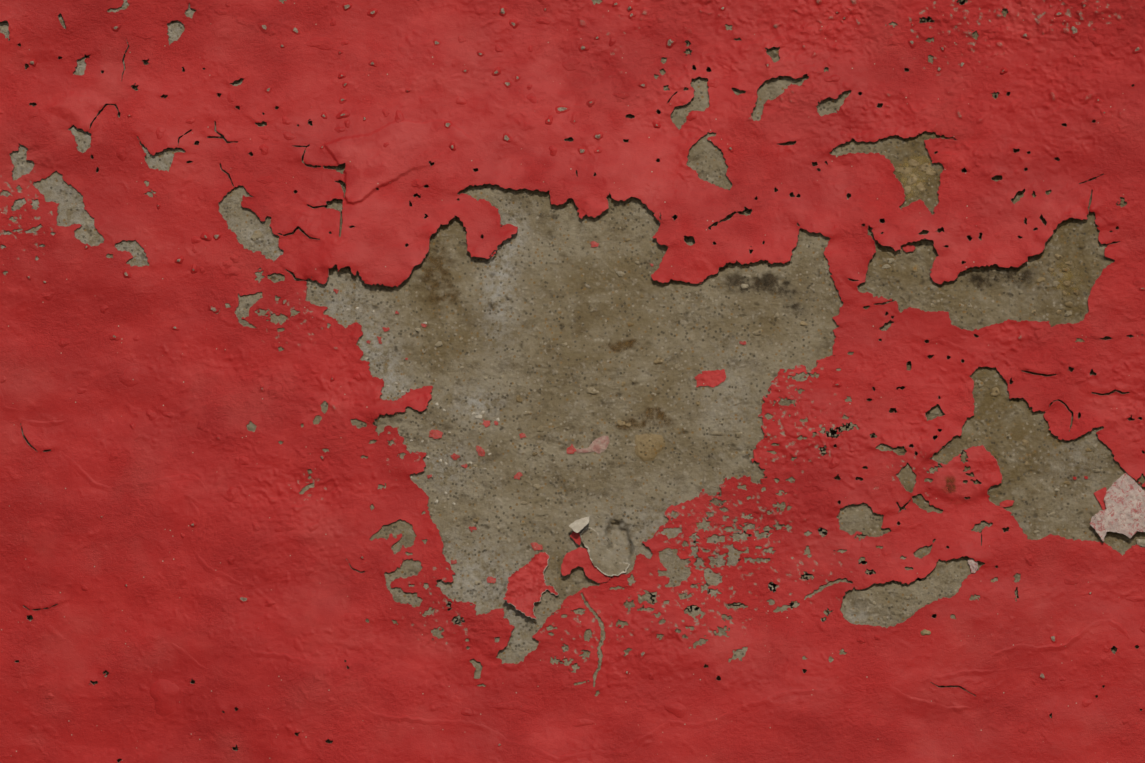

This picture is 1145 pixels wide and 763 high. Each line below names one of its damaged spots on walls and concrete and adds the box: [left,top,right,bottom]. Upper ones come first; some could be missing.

peeling [765,47,780,62]
peeling [732,74,809,121]
peeling [0,144,149,267]
peeling [687,132,732,191]
peeling [830,131,956,214]
peeling [216,184,1145,696]